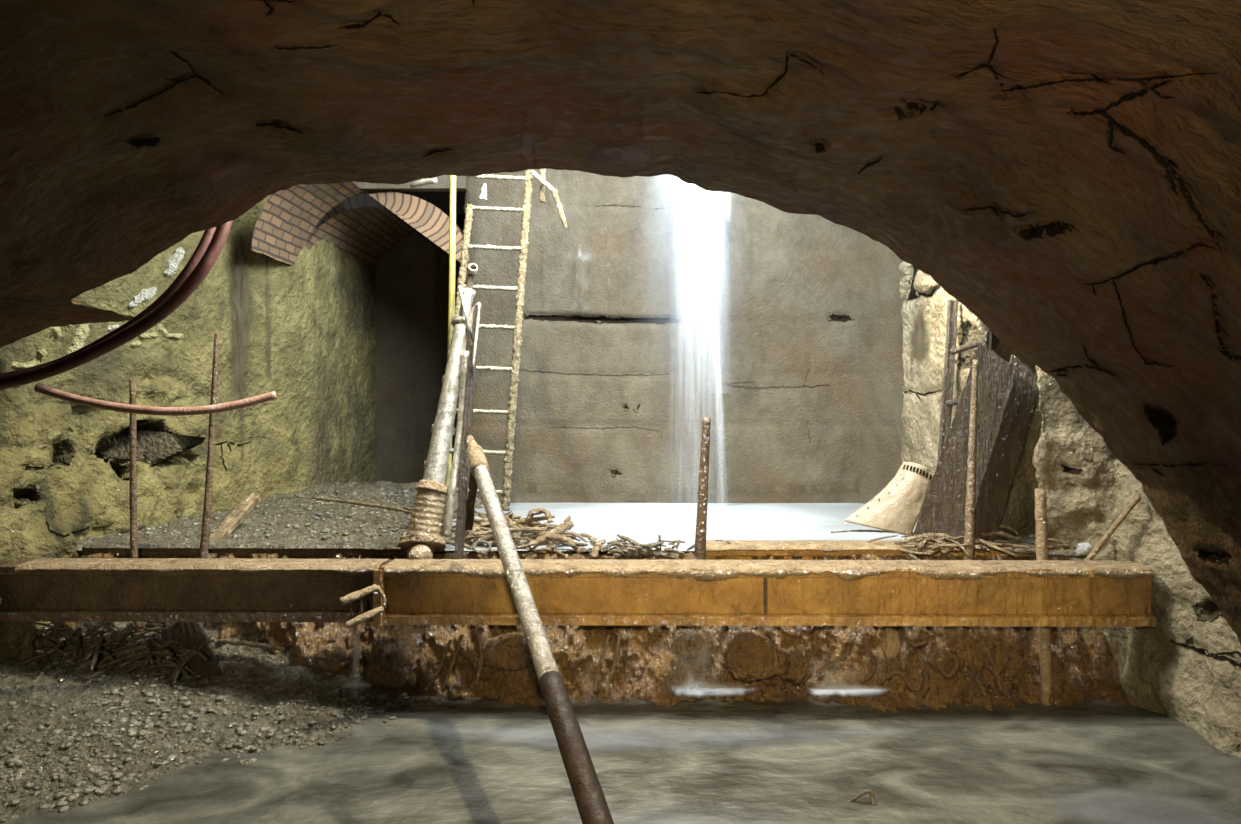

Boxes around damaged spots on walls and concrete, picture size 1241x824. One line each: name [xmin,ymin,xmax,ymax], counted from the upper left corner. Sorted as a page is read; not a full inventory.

crack [955,27,1241,367]
crack [913,284,940,299]
crack [1050,345,1117,377]
crack [1170,636,1241,667]